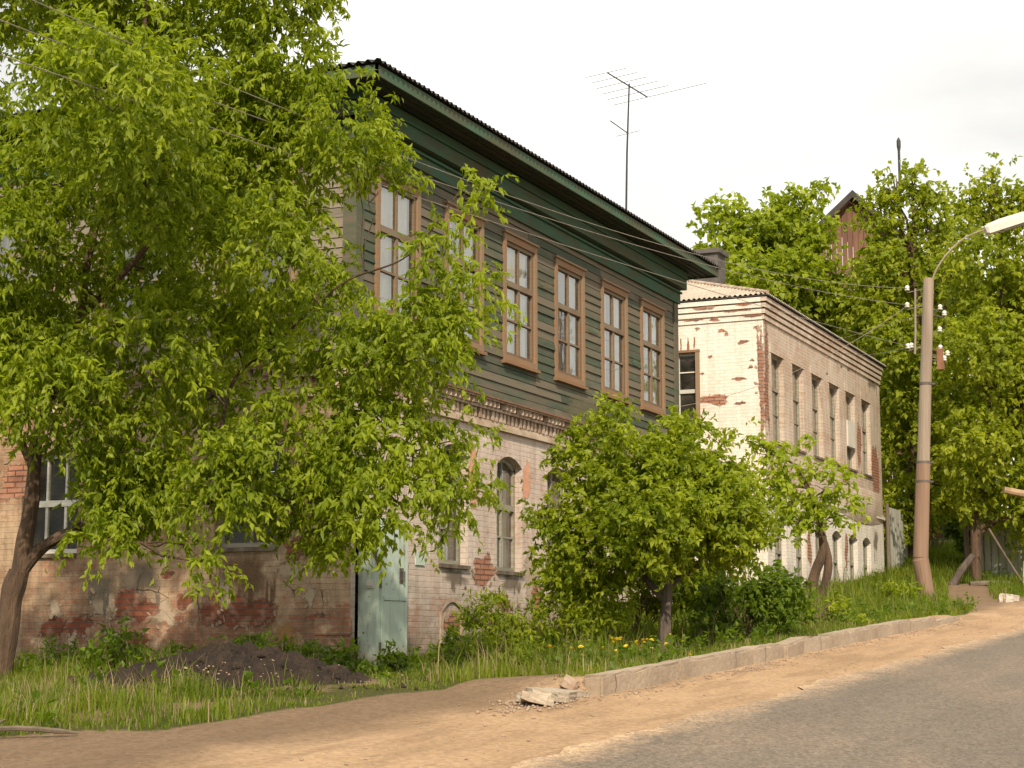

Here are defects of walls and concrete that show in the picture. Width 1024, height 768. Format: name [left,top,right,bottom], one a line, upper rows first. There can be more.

spalling [684,302,770,439]
spalling [857,423,880,494]
spalling [38,576,278,652]
spalling [465,551,511,618]